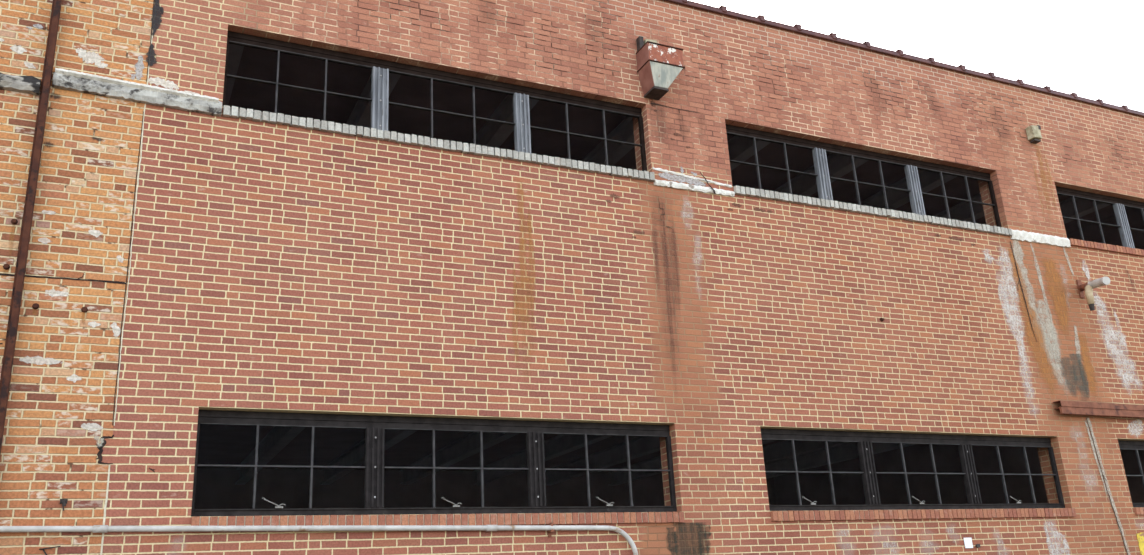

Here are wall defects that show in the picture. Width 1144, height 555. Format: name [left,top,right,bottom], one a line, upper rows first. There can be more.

peeling [131,56,200,95]
damp [985,252,1031,391]
corrosion [1009,253,1051,382]
damp [1031,247,1089,394]
damp [1094,296,1139,386]
damp [667,527,677,554]